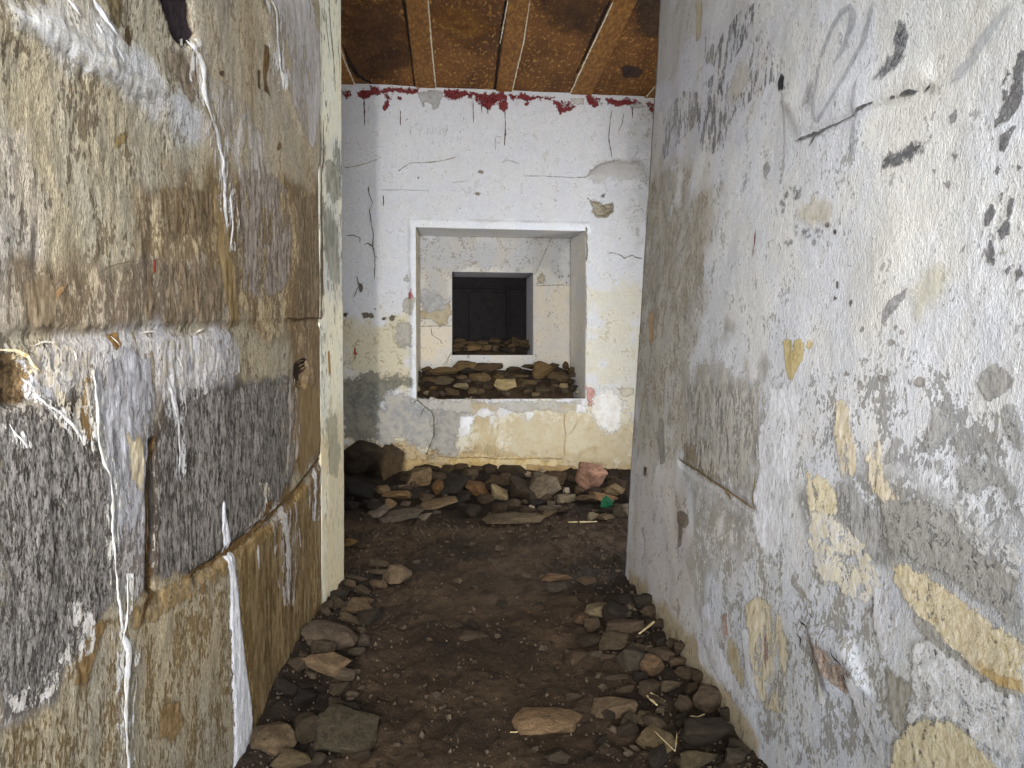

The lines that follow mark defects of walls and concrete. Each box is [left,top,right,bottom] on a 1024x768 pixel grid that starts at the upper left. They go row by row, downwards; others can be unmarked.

spalling [160,0,199,103]
peeling [341,85,654,115]
crack [796,83,931,146]
crack [287,120,464,329]
spalling [587,194,614,218]
crack [412,398,578,460]
crack [185,457,320,578]
crack [679,459,756,509]
peeling [836,364,1024,628]
leakage [222,371,561,768]
peeling [914,614,1022,701]